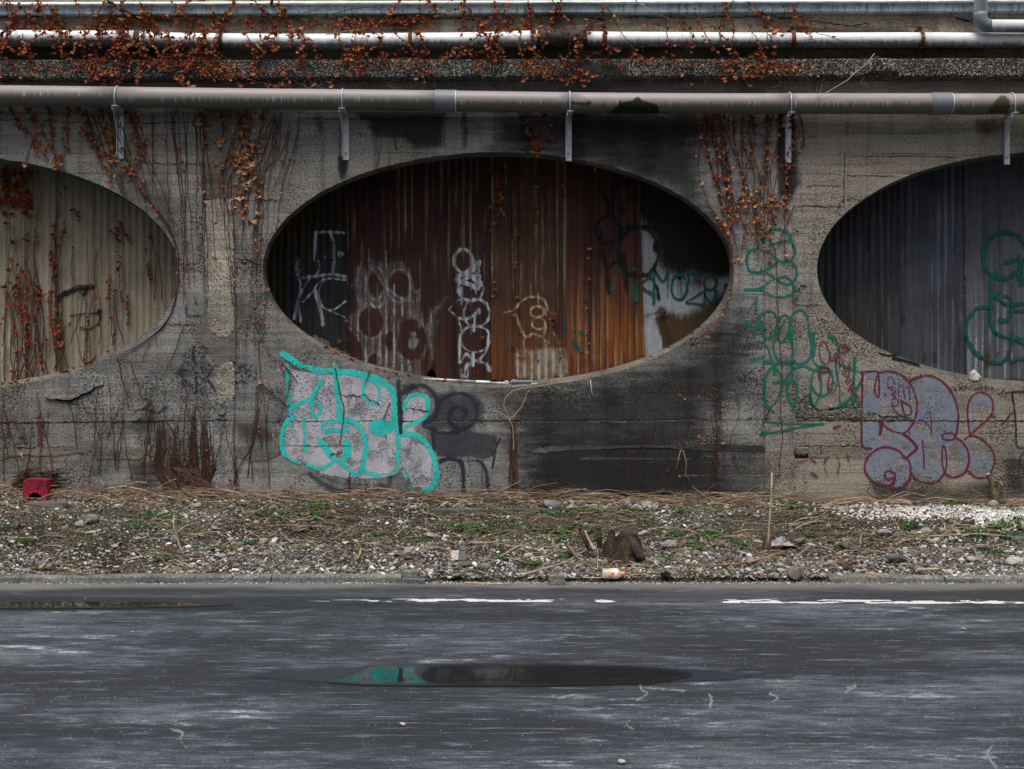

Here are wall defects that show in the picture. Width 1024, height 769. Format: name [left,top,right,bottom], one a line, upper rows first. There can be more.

damp [489,300,756,500]
crack [797,419,1024,447]